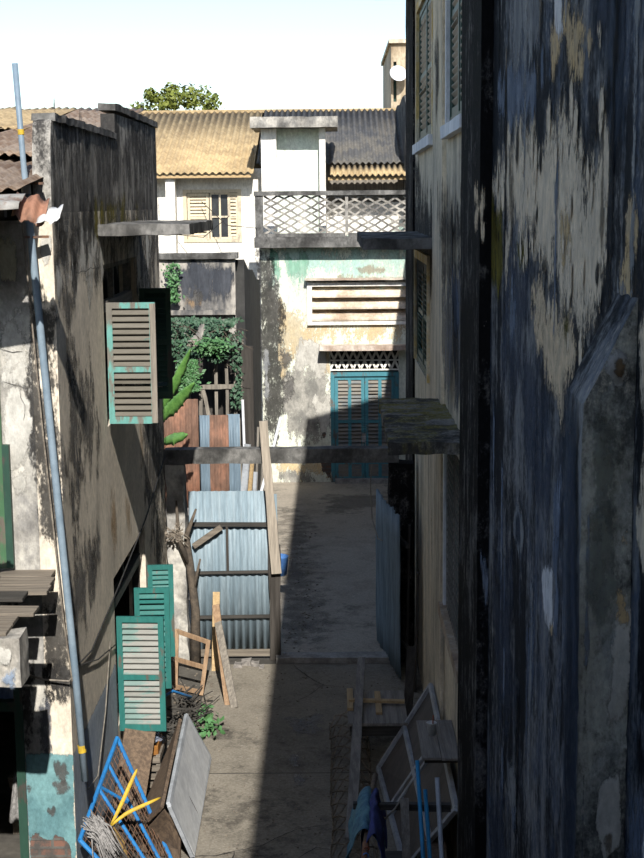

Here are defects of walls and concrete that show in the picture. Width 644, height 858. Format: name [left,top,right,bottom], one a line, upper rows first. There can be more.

peeling [474,2,610,428]
peeling [614,197,638,297]
damp [255,248,309,446]
damp [22,110,160,754]
damp [143,399,168,565]
peeling [621,455,644,573]
peeling [607,588,631,726]
flaking render [30,833,71,858]
flaking render [52,761,70,794]
peeling [595,773,622,858]